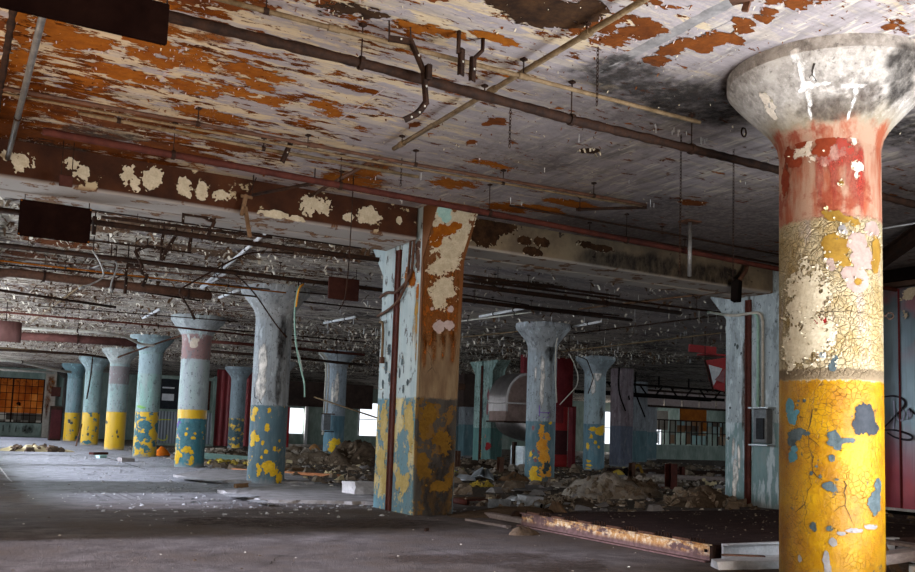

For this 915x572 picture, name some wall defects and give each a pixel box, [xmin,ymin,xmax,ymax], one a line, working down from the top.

peeling [0,8,360,167]
damp [790,44,915,120]
peeling [410,115,597,257]
peeling [850,160,864,180]
peeling [779,206,882,374]
peeling [135,421,153,448]
peeling [177,418,202,450]
peeling [785,398,810,463]
crack [797,409,822,534]
peeling [809,465,839,493]
peeling [826,402,880,462]
peeling [809,478,882,572]